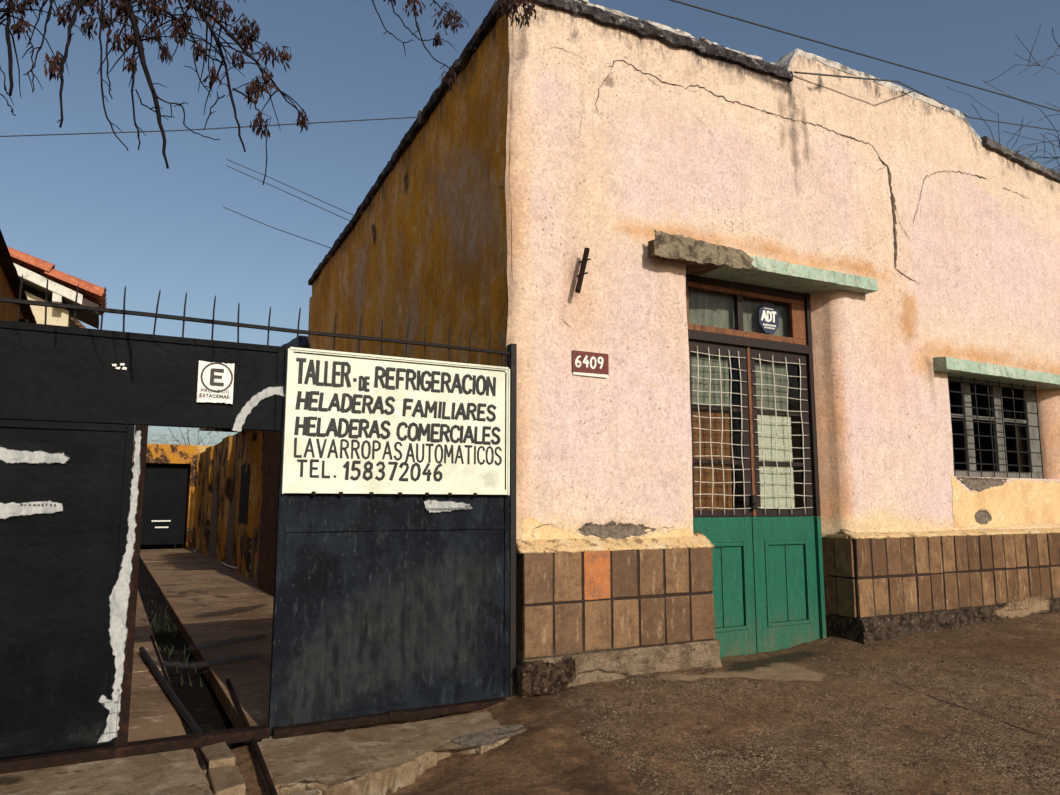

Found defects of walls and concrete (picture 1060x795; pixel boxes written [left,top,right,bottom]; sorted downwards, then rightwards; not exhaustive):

crack [578,60,1030,282]
peeling [521,516,692,540]
peeling [951,476,1060,529]